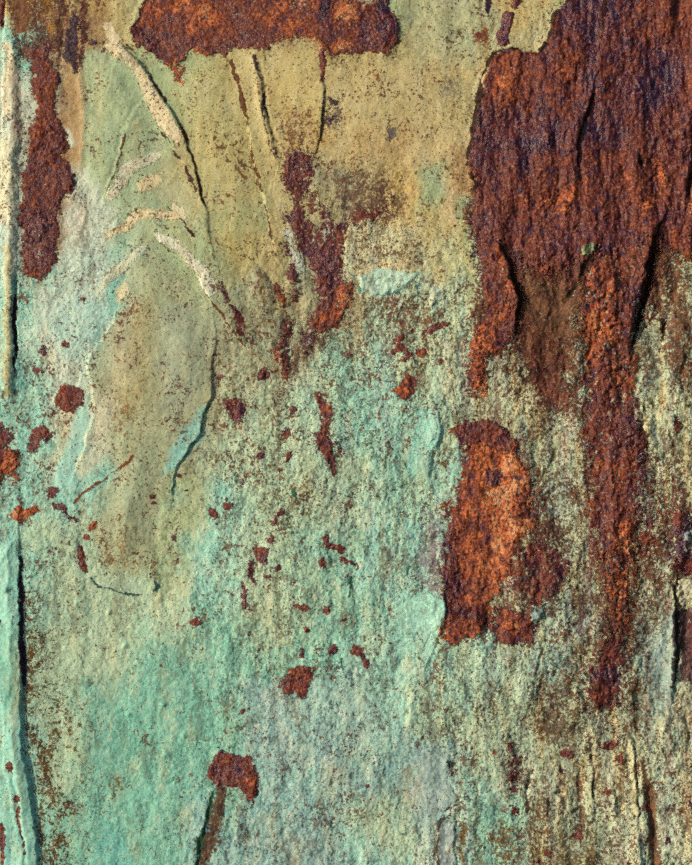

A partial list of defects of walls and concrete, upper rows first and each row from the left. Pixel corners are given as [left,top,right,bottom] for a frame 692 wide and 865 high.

corrosion [129,0,401,87]
corrosion [15,41,76,283]
corrosion [257,148,395,381]
corrosion [435,0,692,718]
corrosion [0,384,85,489]
crack [17,555,28,687]
crack [669,585,681,689]
corrosion [206,746,260,808]